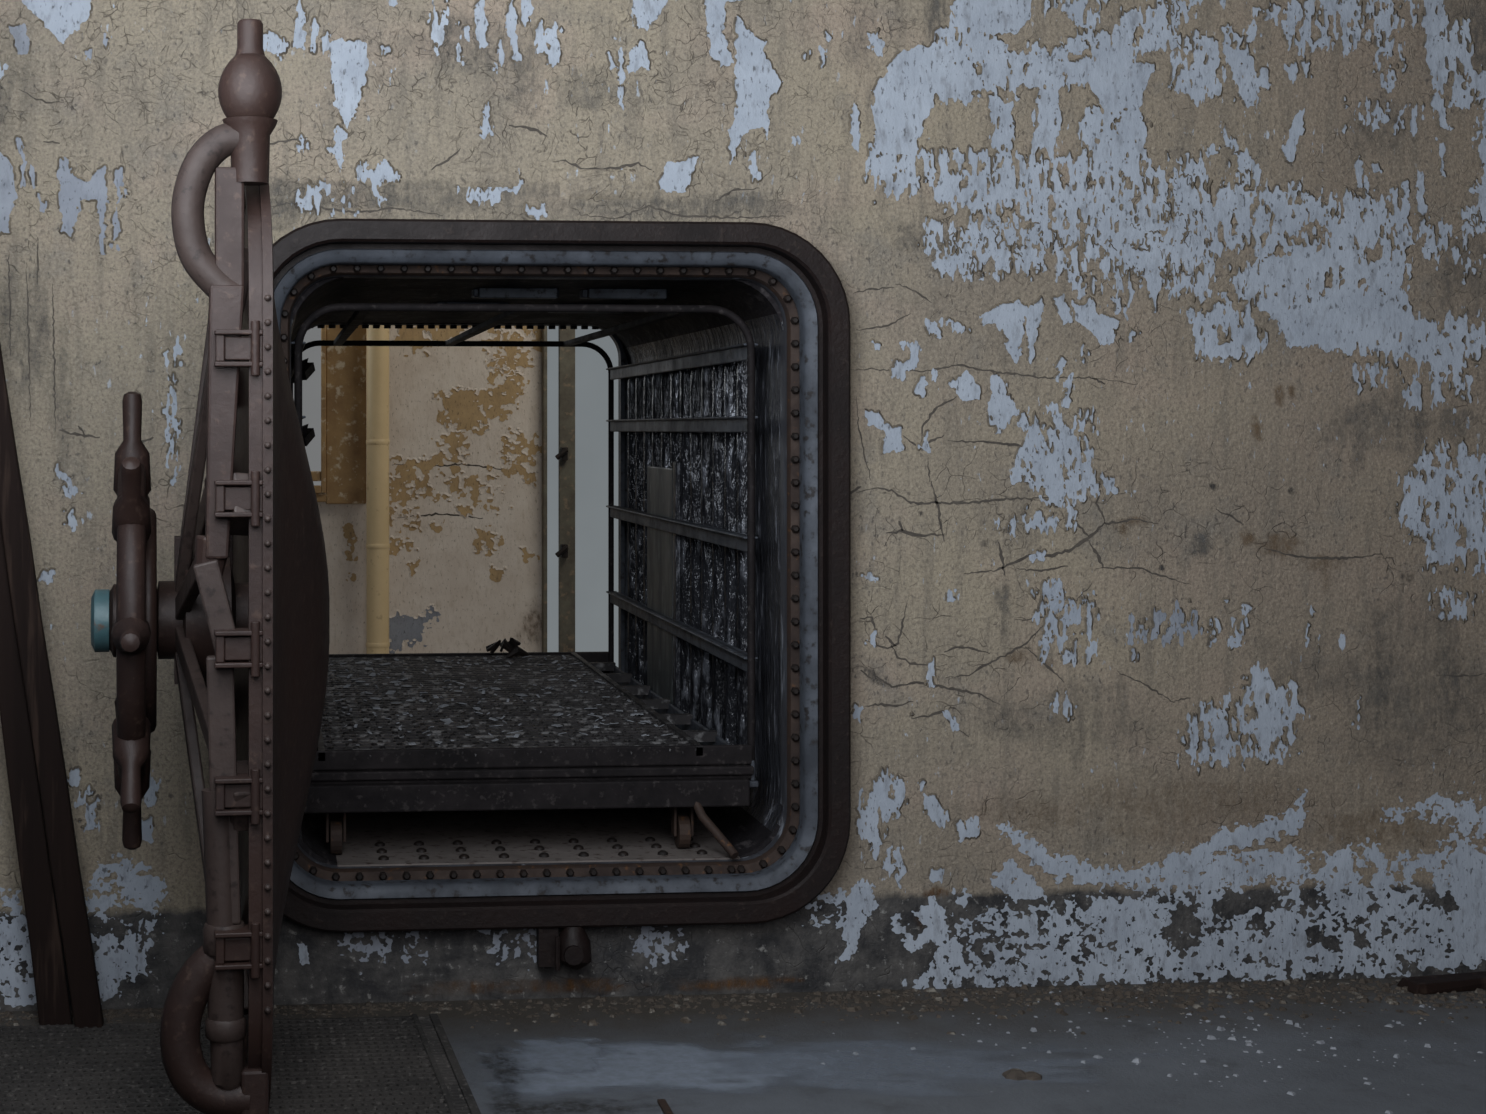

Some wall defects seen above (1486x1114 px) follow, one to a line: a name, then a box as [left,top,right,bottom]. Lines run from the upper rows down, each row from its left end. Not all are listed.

peeling [0,0,93,79]
peeling [263,0,402,218]
peeling [425,0,565,74]
peeling [605,0,668,110]
peeling [702,0,783,184]
crack [853,284,932,331]
peeling [848,0,1486,667]
peeling [389,325,542,582]
crack [850,364,1189,737]
peeling [1176,661,1306,777]
peeling [0,887,37,1008]
peeling [802,765,1486,989]